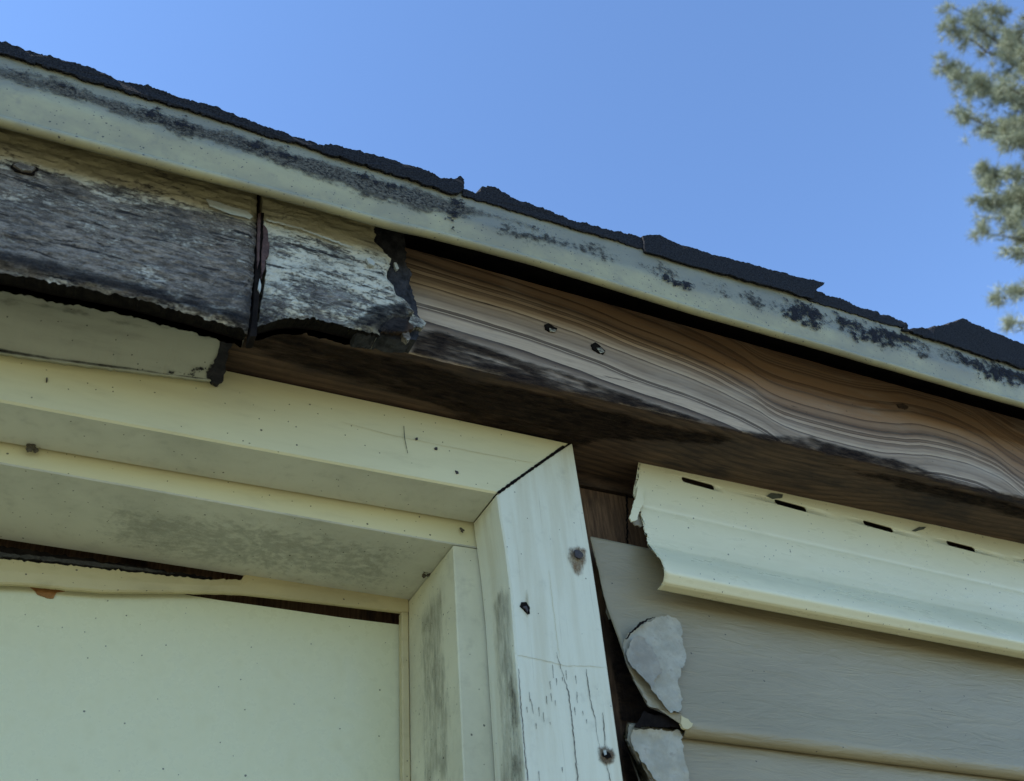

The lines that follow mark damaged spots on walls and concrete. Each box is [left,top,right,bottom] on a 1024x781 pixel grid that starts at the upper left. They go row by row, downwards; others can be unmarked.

water stain [139,104,201,131]
water stain [238,136,310,170]
peeling [206,199,253,219]
water stain [0,251,249,323]
water stain [663,271,695,290]
water stain [348,303,408,332]
water stain [782,297,921,351]
water stain [0,349,213,378]
corrosion [570,548,585,573]
crack [518,581,611,781]
peeling [623,615,686,713]
peeling [631,729,689,781]